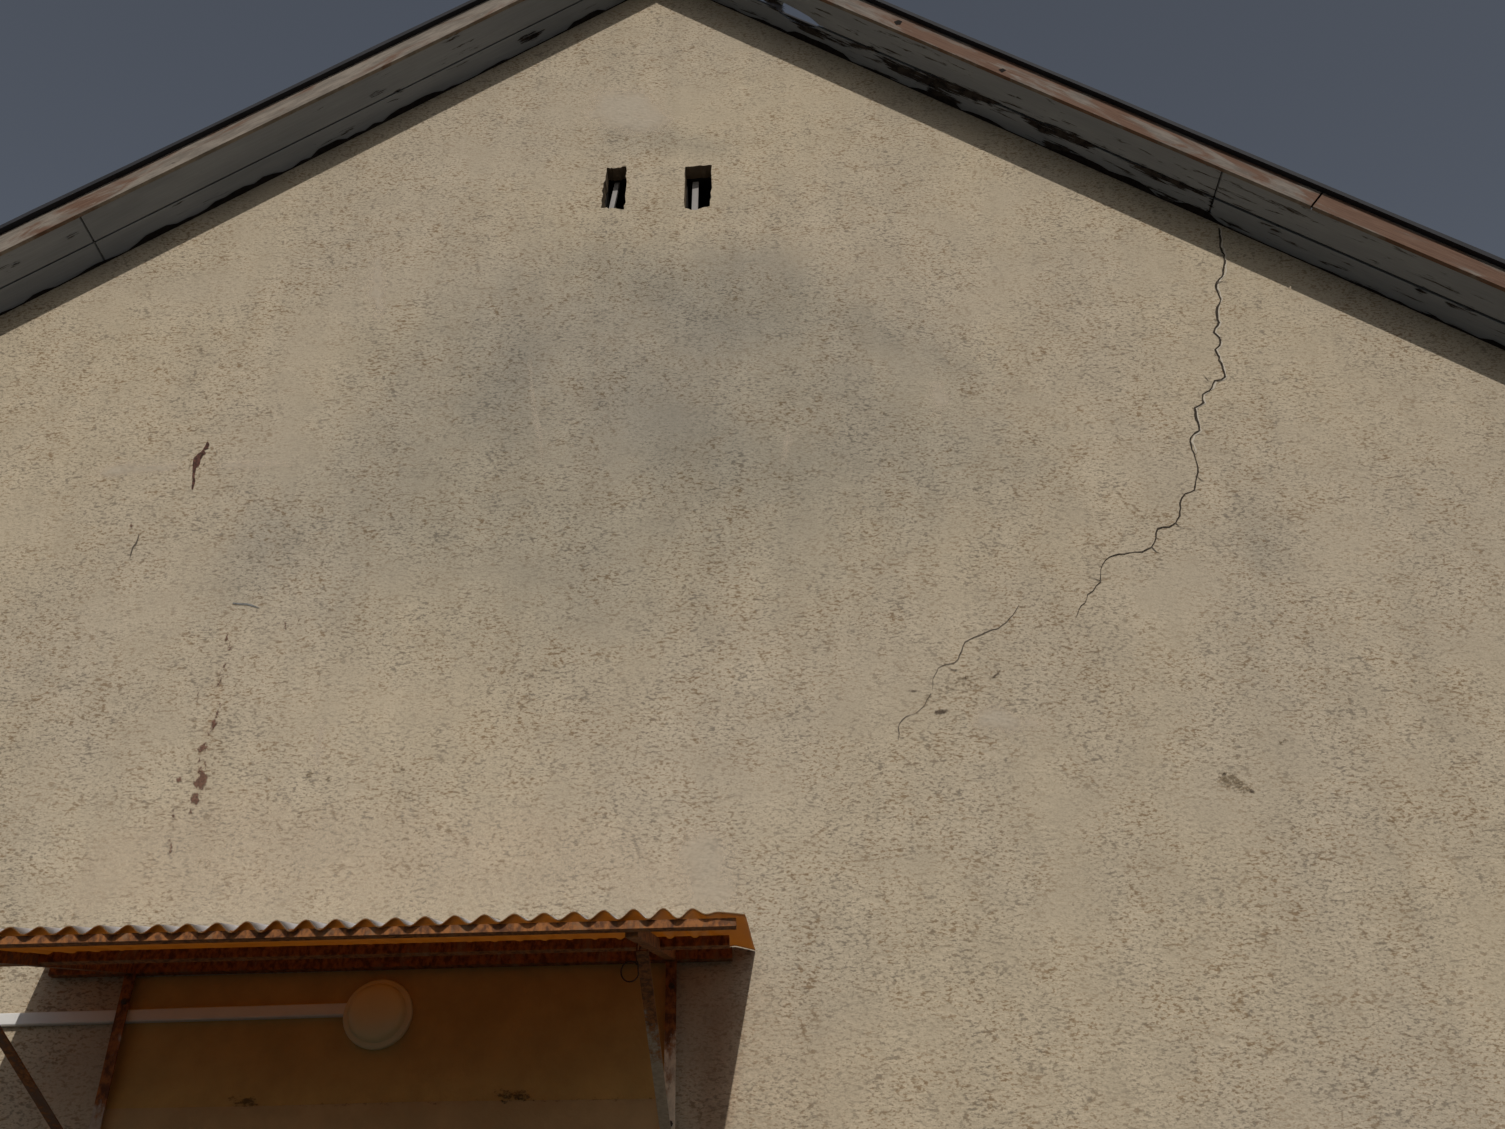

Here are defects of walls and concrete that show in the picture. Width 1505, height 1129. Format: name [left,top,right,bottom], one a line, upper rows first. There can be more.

peeling [0,0,627,316]
peeling [711,0,1505,350]
crack [1077,228,1227,615]
rust [172,635,231,818]
crack [898,605,1019,740]